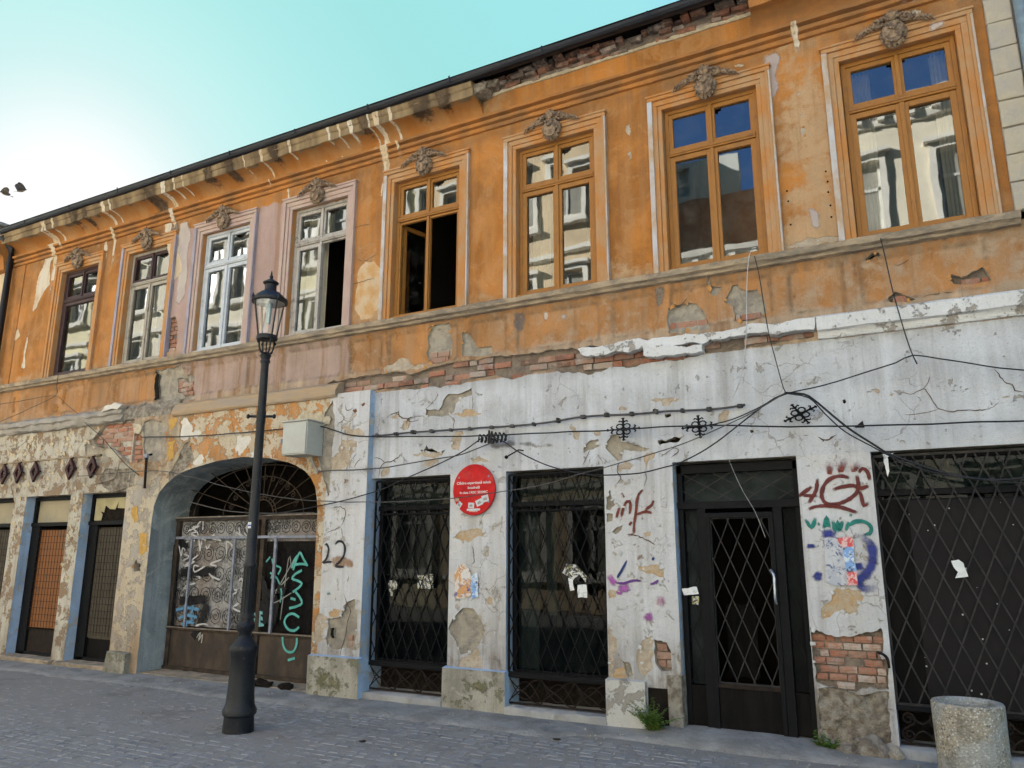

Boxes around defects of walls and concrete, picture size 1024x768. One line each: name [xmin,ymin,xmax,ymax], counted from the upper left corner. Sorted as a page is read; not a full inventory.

flaking render [707,277,767,324]
flaking render [946,267,991,285]
crack [389,392,473,429]
flaking render [271,302,814,556]
crack [902,377,992,415]
flaking render [1,365,256,580]
peeling [120,506,147,610]
flaking render [313,599,357,650]
flaking render [448,608,496,668]
peeling [608,623,672,726]
flaking render [810,588,892,744]